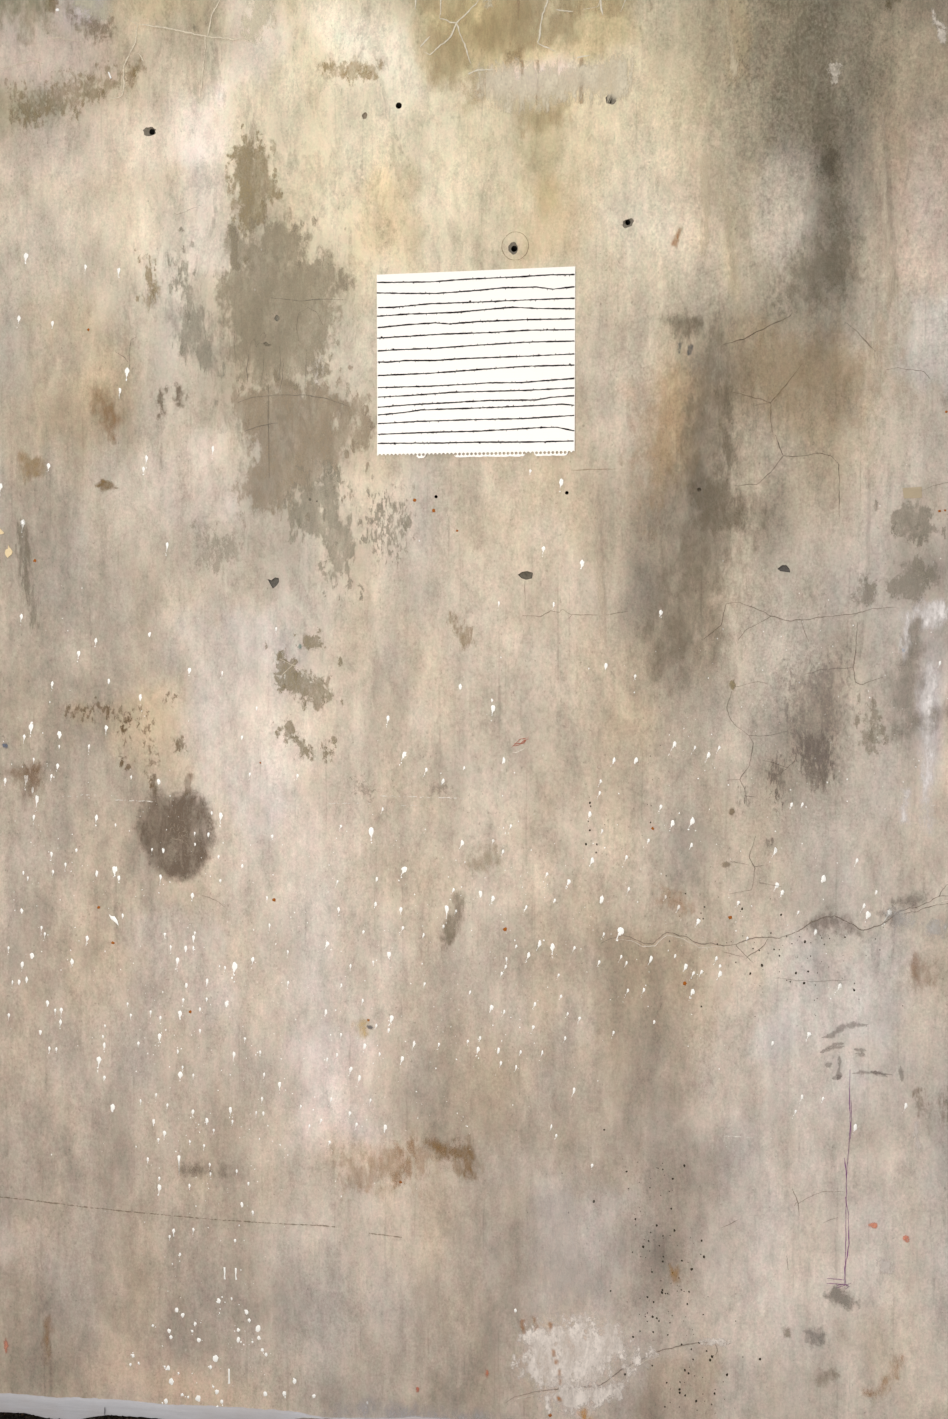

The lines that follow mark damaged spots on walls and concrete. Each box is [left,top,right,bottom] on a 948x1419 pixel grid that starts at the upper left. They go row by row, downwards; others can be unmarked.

crack [415,0,494,74]
crack [537,0,626,58]
damp [828,62,843,84]
damp [65,701,154,742]
damp [140,762,213,879]
crack [602,887,948,961]